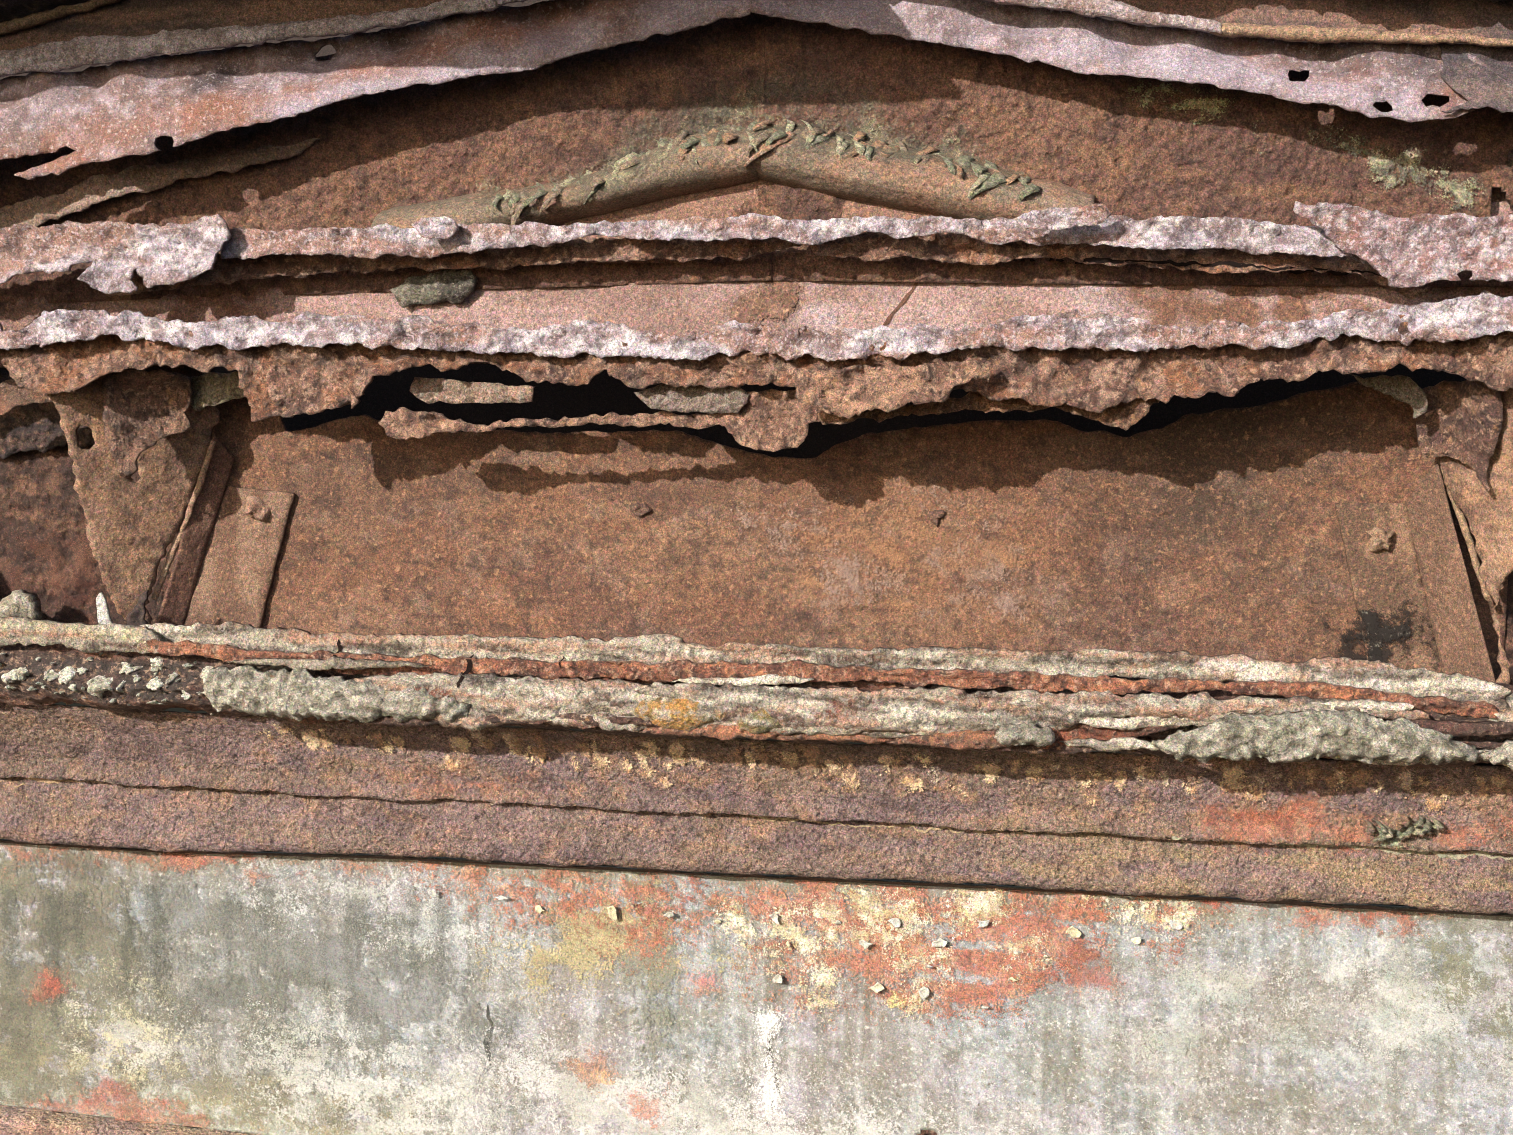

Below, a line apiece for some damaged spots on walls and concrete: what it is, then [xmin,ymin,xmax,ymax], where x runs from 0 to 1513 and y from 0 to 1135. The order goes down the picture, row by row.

rust [727,281,803,327]
peeling [0,379,53,415]
peeling [101,369,244,481]
peeling [1416,381,1503,491]
rust [728,449,1072,646]
rust [1319,597,1439,669]
rust [0,639,1513,770]
damp [0,846,763,1135]
damp [745,1003,791,1125]
damp [1395,911,1513,1097]